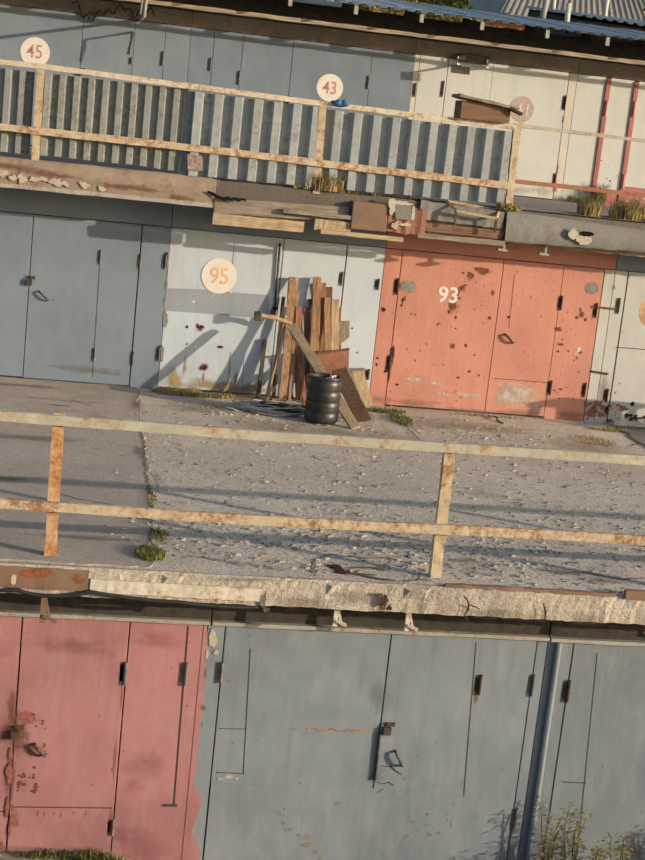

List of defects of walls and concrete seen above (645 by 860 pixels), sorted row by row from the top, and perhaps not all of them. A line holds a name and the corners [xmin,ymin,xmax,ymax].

rust [0,164,67,177]
peeling [0,170,106,191]
peeling [586,383,645,422]
crack [137,389,159,564]
rust [20,568,51,578]